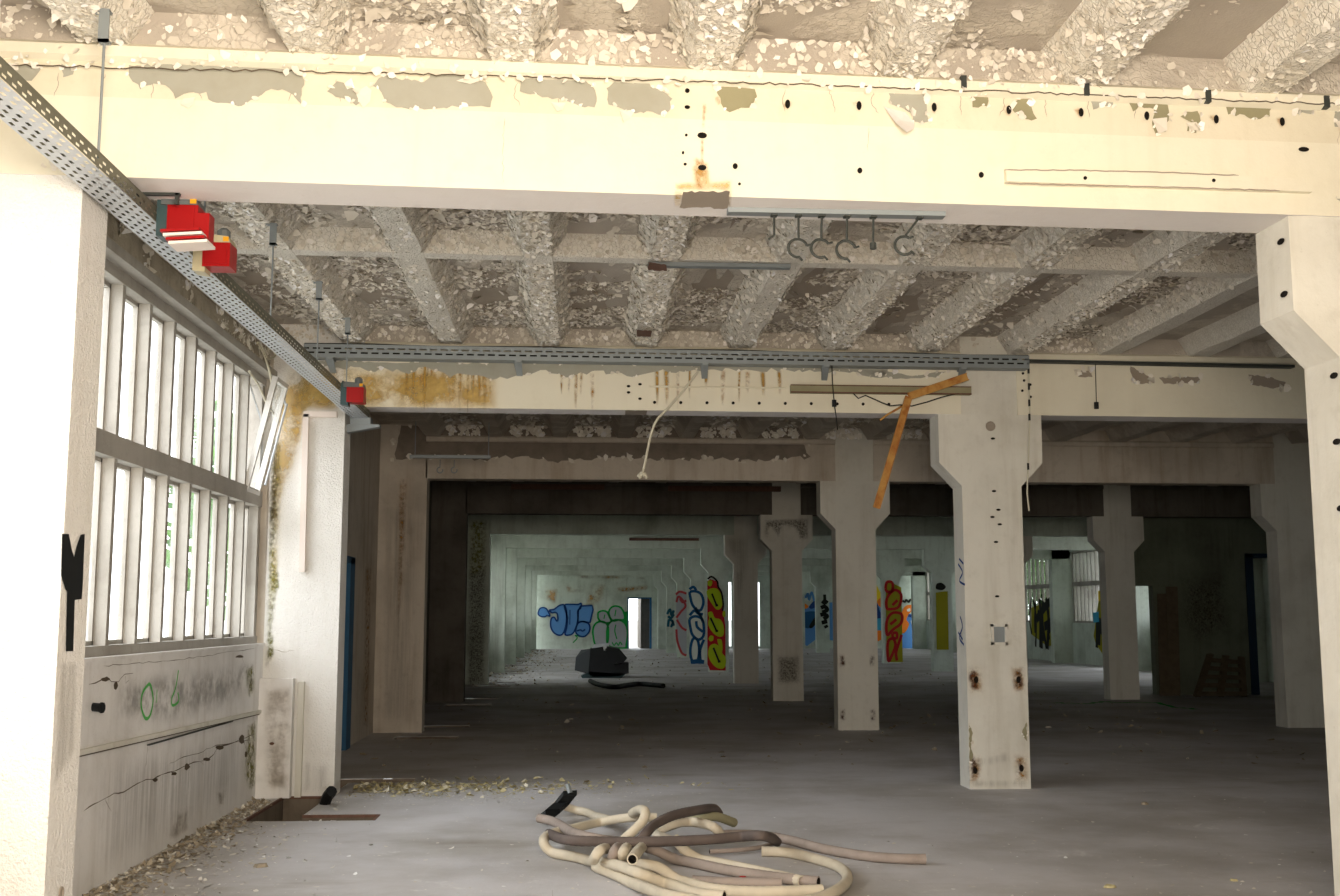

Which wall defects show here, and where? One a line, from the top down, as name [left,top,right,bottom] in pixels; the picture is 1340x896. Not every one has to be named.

peeling [0,0,1340,136]
peeling [200,190,1257,381]
peeling [1130,366,1203,387]
crack [84,734,254,811]